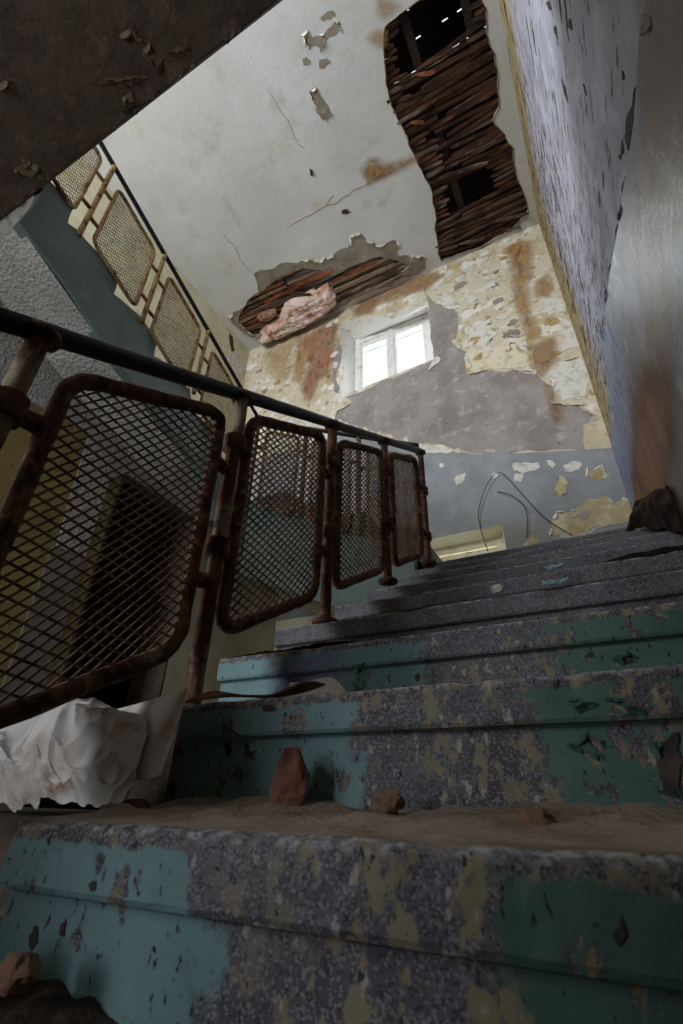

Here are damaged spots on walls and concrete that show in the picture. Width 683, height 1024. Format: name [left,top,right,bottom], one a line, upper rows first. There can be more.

peeling [301,10,341,69]
peeling [546,0,573,42]
peeling [307,87,333,123]
peeling [618,87,636,160]
crack [291,158,415,225]
flaking render [225,231,428,361]
peeling [326,125,611,497]
damp [510,242,554,371]
damp [269,325,337,399]
peeling [523,496,632,546]
peeling [646,732,683,799]
peeling [28,925,38,951]